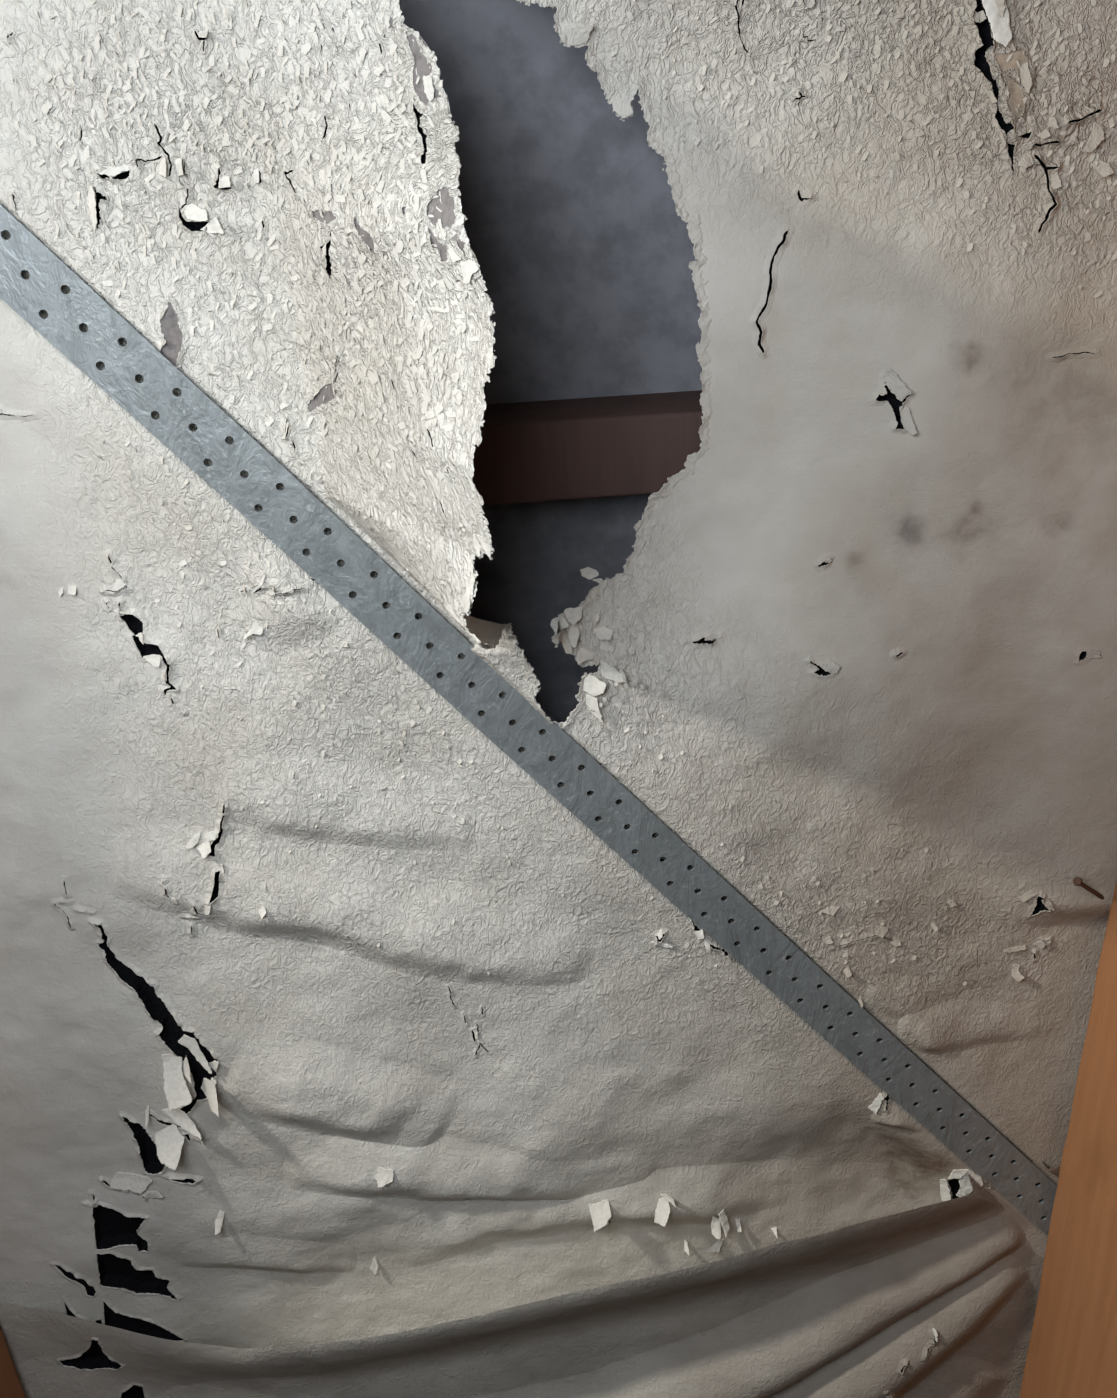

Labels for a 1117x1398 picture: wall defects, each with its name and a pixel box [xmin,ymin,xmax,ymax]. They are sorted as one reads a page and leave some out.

peeling [559,22,594,46]
peeling [612,97,633,118]
crack [962,0,1064,240]
peeling [15,0,492,630]
crack [749,222,795,359]
peeling [218,554,378,711]
peeling [366,667,432,791]
peeling [580,567,603,583]
peeling [550,607,671,731]
peeling [145,1034,219,1170]
peeling [215,1210,225,1235]
peeling [372,1167,394,1188]